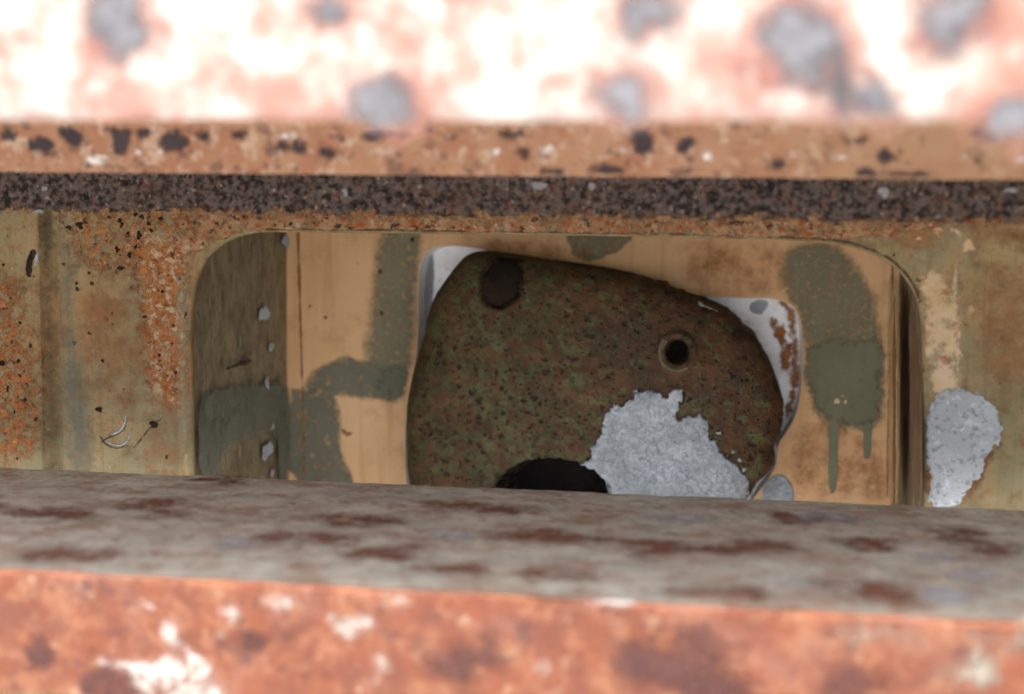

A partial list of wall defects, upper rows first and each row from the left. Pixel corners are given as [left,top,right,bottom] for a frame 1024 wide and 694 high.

peeling [750,300,768,314]
rust [0,275,46,465]
rust [46,207,1024,506]
peeling [580,389,794,501]
rust [667,586,767,601]
rust [817,581,924,603]
rust [25,636,53,666]
rust [79,667,135,694]